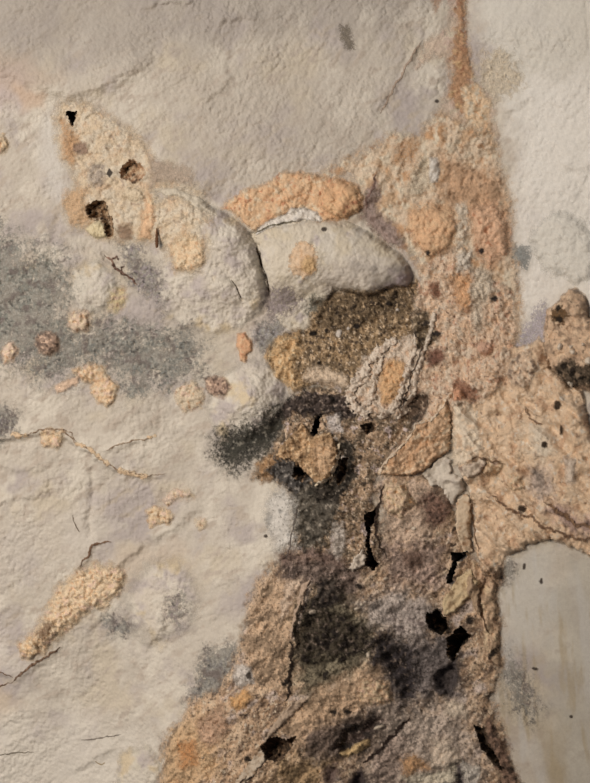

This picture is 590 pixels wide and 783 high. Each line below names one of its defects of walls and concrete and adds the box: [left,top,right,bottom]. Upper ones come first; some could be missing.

corrosion [416,0,499,148]
leakage [0,216,208,398]
leakage [0,405,19,444]
crack [10,428,165,479]
leakage [208,397,290,479]
flaking render [159,201,520,783]
crack [0,647,60,687]